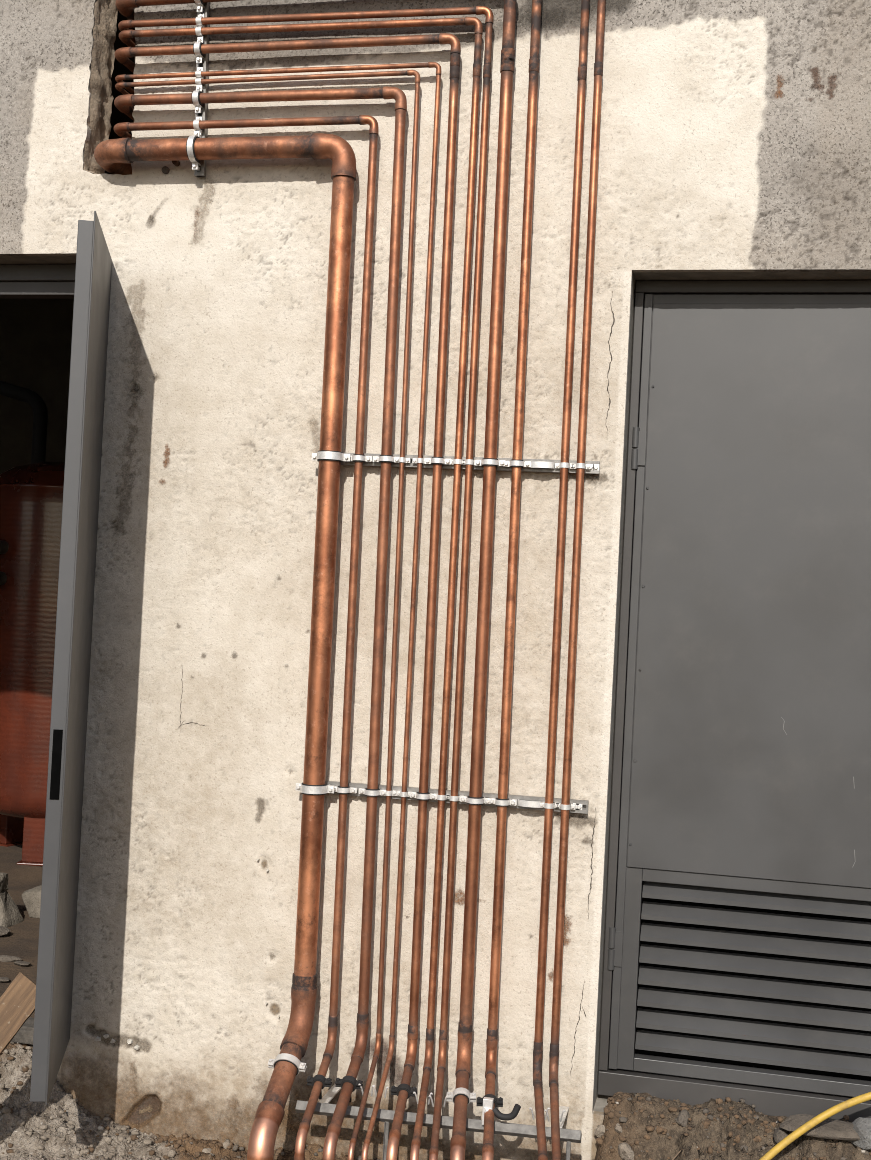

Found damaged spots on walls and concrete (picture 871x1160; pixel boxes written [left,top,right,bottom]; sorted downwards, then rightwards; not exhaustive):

damp [526,0,630,26]
corrosion [809,67,836,100]
crack [606,291,615,430]
crack [588,808,596,919]
crack [570,982,586,1074]